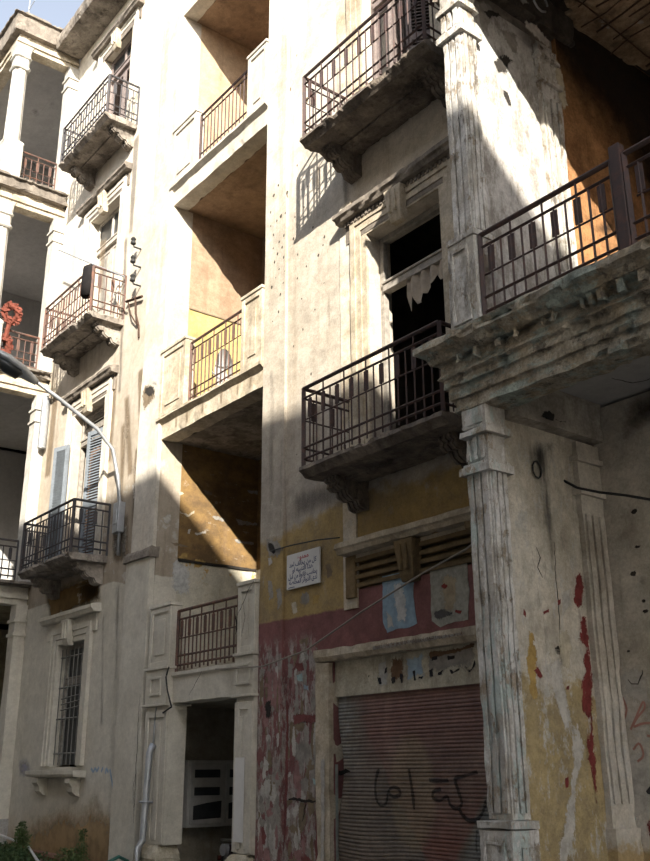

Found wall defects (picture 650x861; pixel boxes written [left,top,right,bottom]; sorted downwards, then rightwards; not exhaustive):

spalling [564,0,650,70]
peeling [257,638,318,861]
peeling [526,572,598,861]
peeling [630,750,650,836]